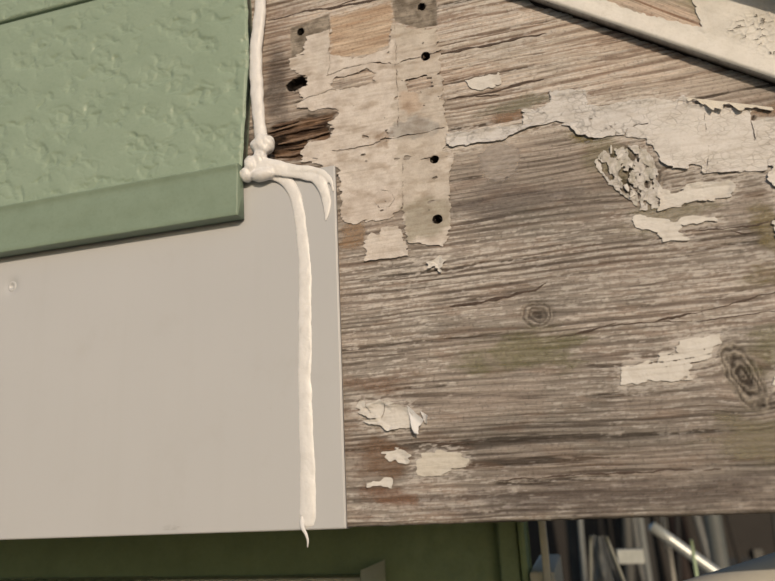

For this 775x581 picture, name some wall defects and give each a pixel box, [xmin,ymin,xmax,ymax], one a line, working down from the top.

peeling [607,0,702,27]
crack [729,14,775,54]
peeling [288,23,775,272]
peeling [620,334,722,385]
peeling [355,399,428,434]
peeling [381,447,469,477]
peeling [366,477,393,488]